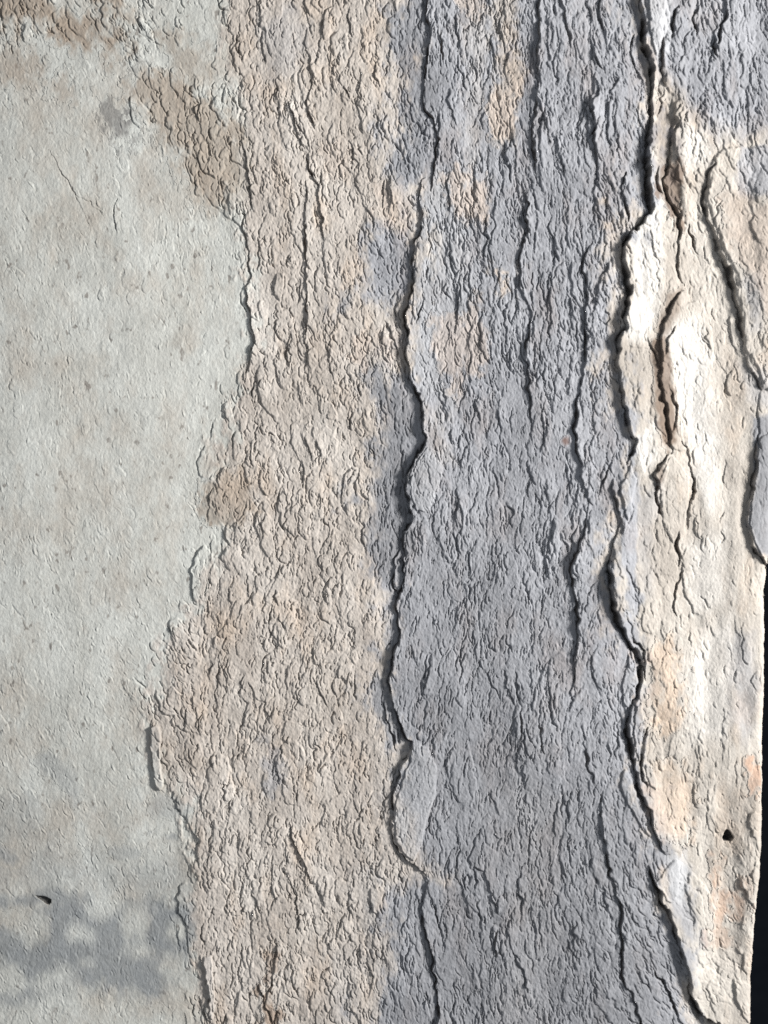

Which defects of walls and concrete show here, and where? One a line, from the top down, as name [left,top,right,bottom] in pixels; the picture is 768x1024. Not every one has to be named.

crack [630,0,729,126]
crack [382,0,445,1024]
crack [568,148,762,796]
peeling [660,457,690,545]
crack [745,437,767,570]
peeling [750,435,768,563]
crack [516,708,545,765]
peeling [622,664,653,779]
peeling [621,770,651,837]
crack [585,748,721,1024]
peeling [657,860,681,903]
peeling [203,956,216,1020]